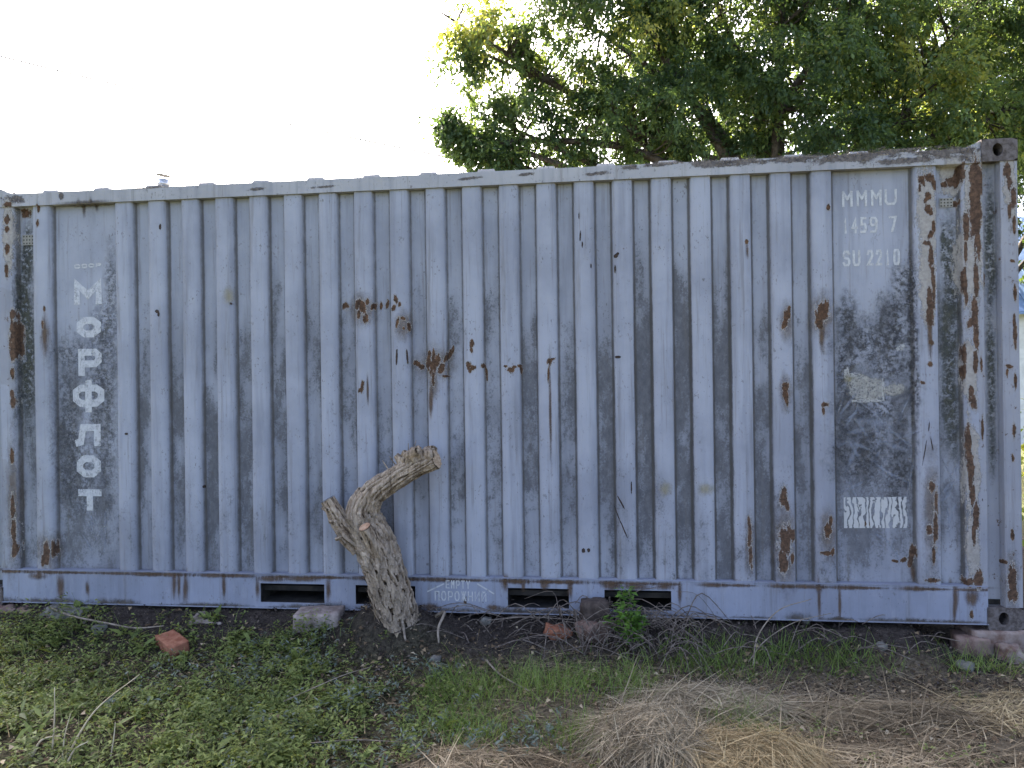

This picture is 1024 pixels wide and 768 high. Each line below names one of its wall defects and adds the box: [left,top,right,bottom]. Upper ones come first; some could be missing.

corrosion [1002,160,1017,236]
corrosion [7,307,26,380]
corrosion [342,294,412,332]
corrosion [396,345,455,413]
corrosion [781,305,791,332]
corrosion [813,298,831,345]
corrosion [917,149,985,548]
corrosion [1005,364,1018,392]
corrosion [2,487,365,600]
corrosion [408,576,583,596]
corrosion [768,483,880,616]
corrosion [999,558,1019,605]